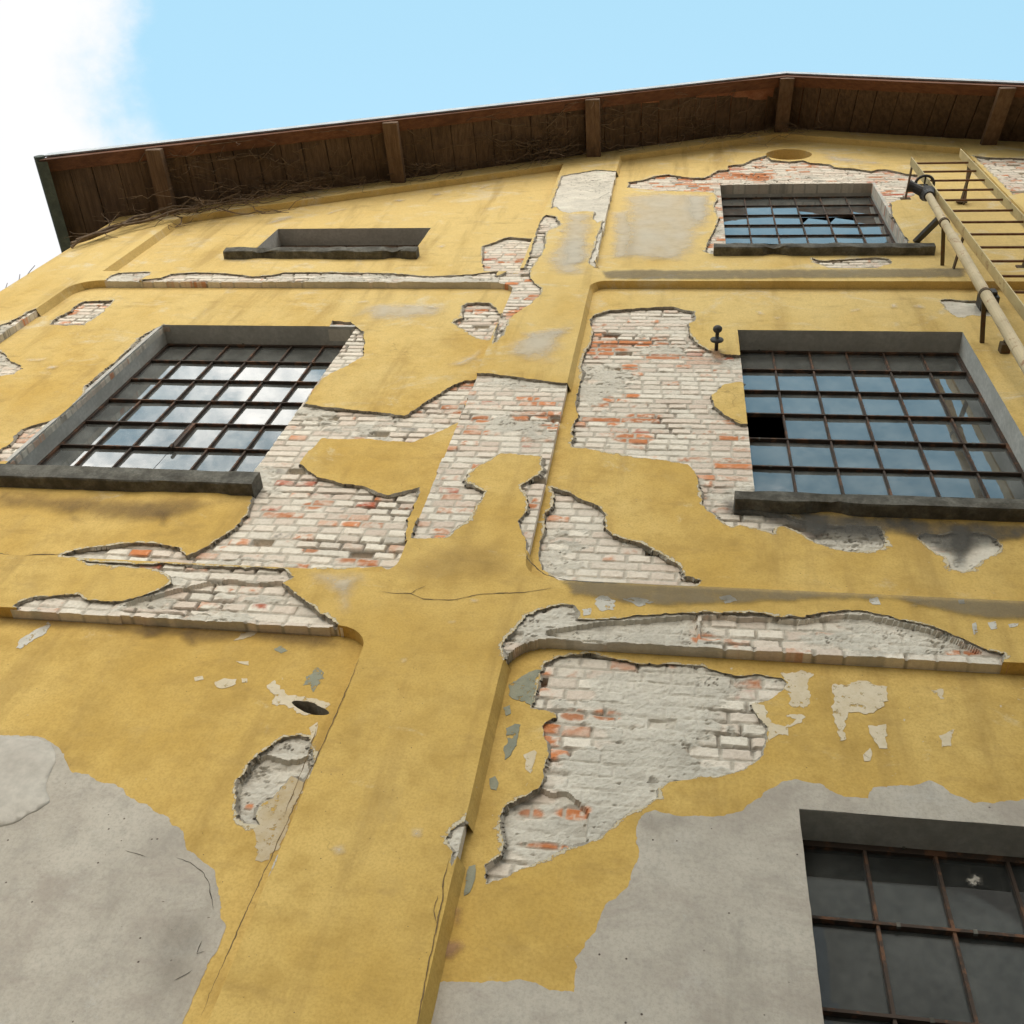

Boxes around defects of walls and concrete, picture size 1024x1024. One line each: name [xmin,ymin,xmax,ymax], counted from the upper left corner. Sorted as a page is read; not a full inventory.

flaking render [0,155,918,376]
peeling [0,735,226,1024]
peeling [194,676,247,689]
flaking render [232,667,330,875]
flaking render [0,306,892,653]
crack [387,551,578,600]
peeling [431,595,1024,1024]
damp [727,502,1024,562]